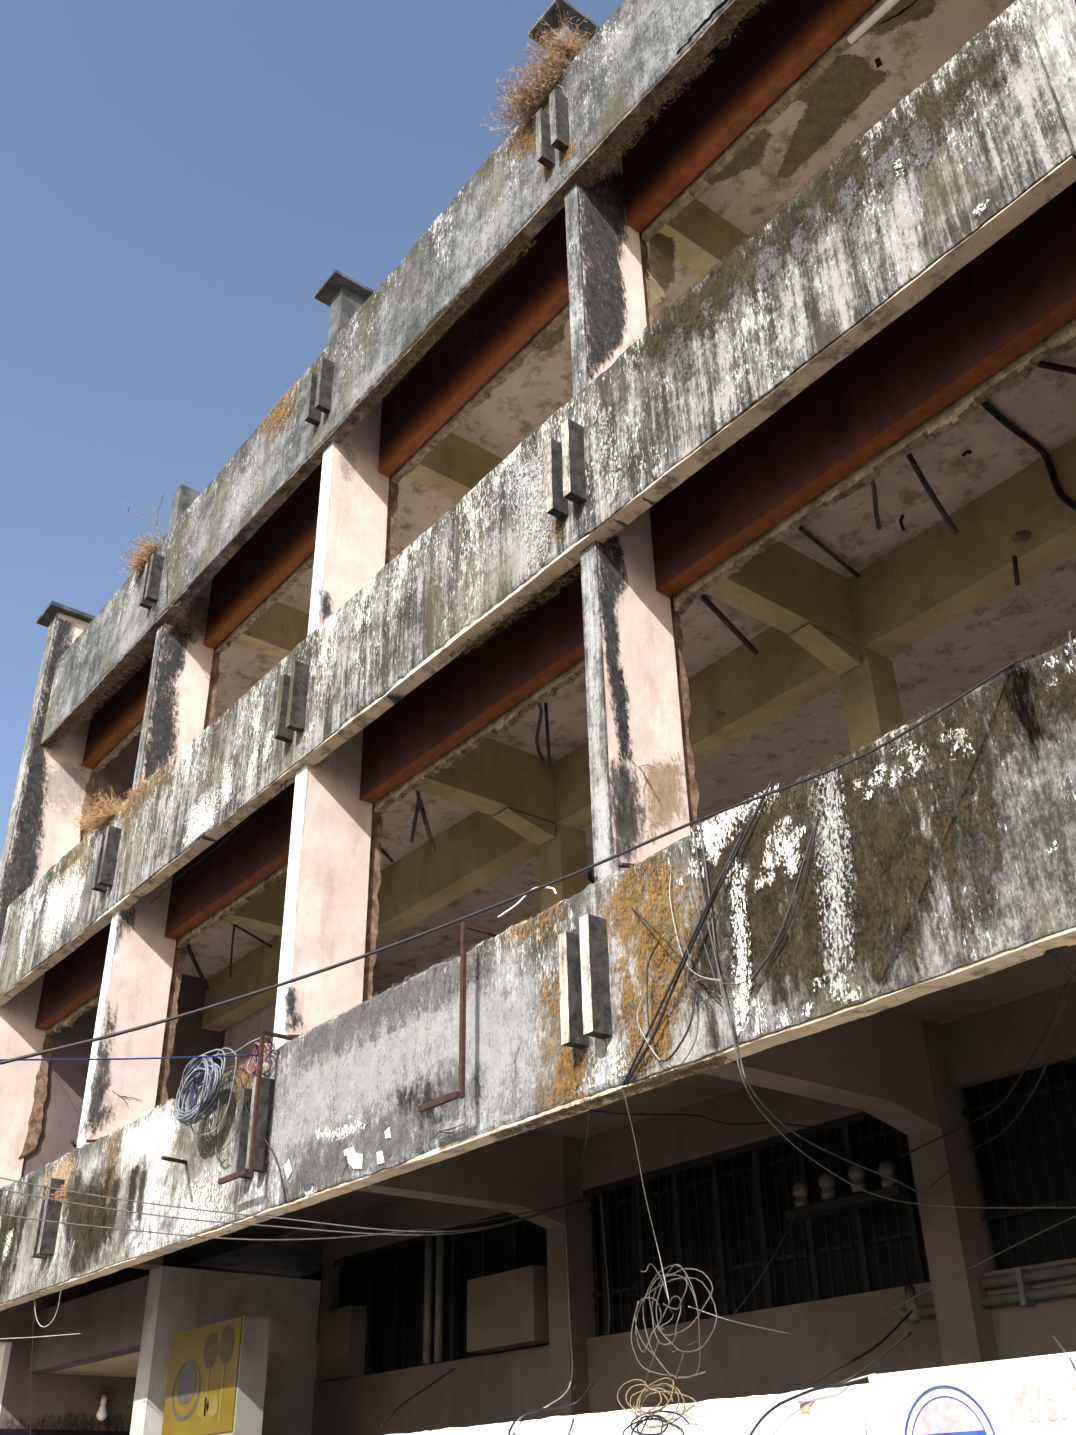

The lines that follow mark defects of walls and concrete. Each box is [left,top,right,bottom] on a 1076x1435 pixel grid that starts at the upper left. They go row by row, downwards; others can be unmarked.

damp [575,18,1037,382]
damp [505,442,553,565]
spalling [673,317,1076,615]
damp [0,616,89,972]
damp [78,999,116,1138]
damp [137,620,194,784]
corrosion [506,903,565,947]
corrosion [535,962,595,1110]
damp [596,535,649,870]
corrosion [593,752,703,1077]
damp [684,631,1076,1049]
damp [0,1150,146,1295]